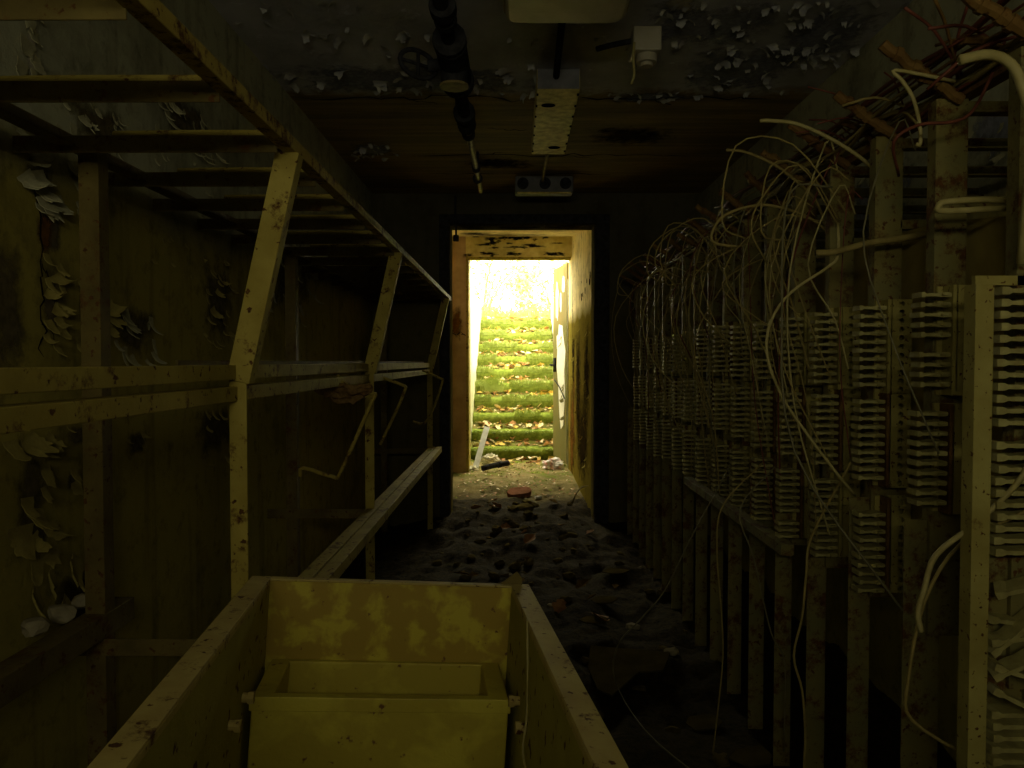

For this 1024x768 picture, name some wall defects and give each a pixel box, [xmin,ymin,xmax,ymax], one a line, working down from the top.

peeling [17,153,74,222]
peeling [459,226,578,257]
peeling [43,253,78,357]